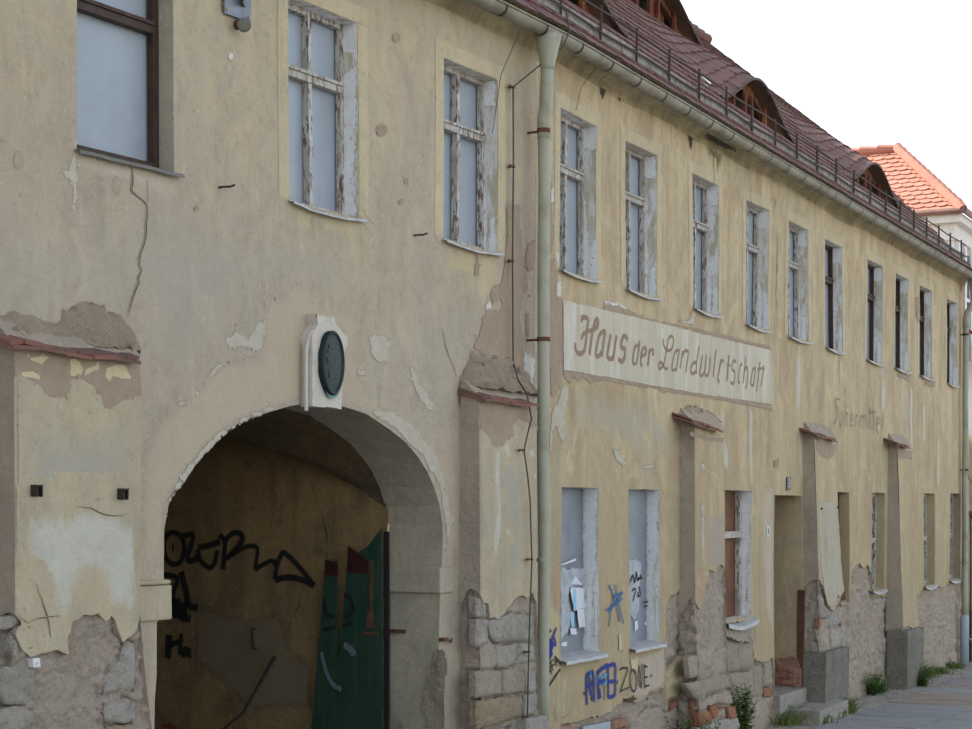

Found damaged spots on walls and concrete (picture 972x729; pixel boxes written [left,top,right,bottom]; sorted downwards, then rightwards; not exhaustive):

flaking render [14,349,143,410]
crack [128,168,148,315]
flaking render [140,265,460,581]
flaking render [469,177,535,386]
flaking render [480,401,538,447]
flaking render [549,183,773,452]
crack [19,584,60,637]
spalling [0,612,179,729]
spalling [422,649,447,729]
spalling [460,589,539,729]
spalling [560,459,888,729]
spalling [917,582,962,672]